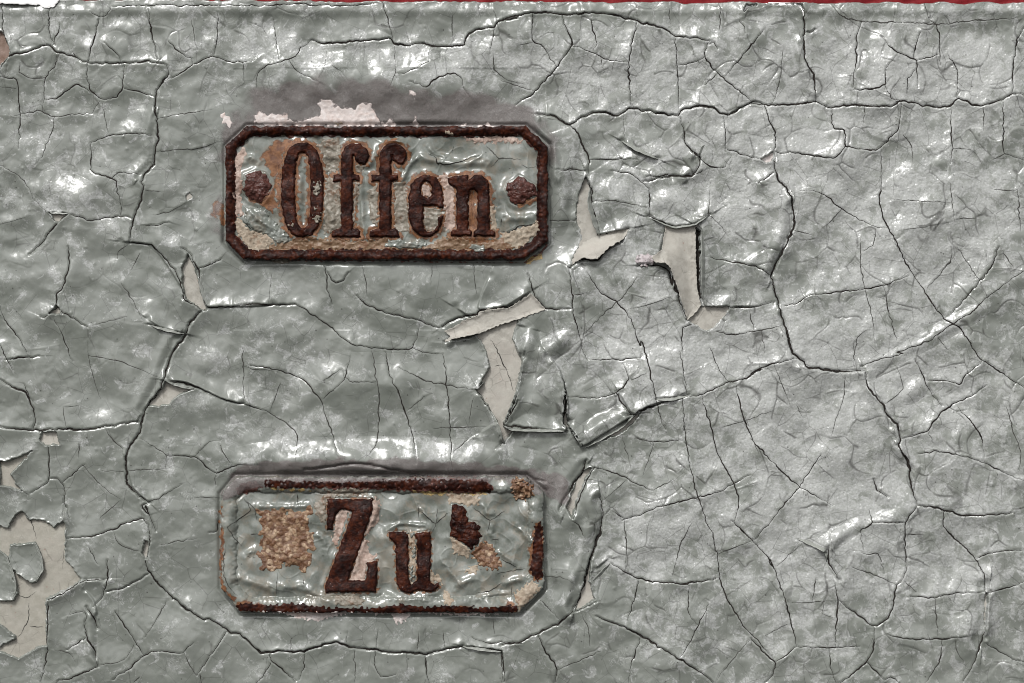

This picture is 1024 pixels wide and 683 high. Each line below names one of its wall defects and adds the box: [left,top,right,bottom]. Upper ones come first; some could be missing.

peeling [1,453,29,494]
peeling [0,508,81,658]
peeling [41,432,59,445]
crack [0,3,669,683]
corrosion [221,80,538,263]
peeling [232,99,540,264]
corrosion [218,457,570,605]
peeling [444,294,569,442]
peeling [571,179,629,265]
crack [256,2,1024,683]
peeling [635,216,729,330]